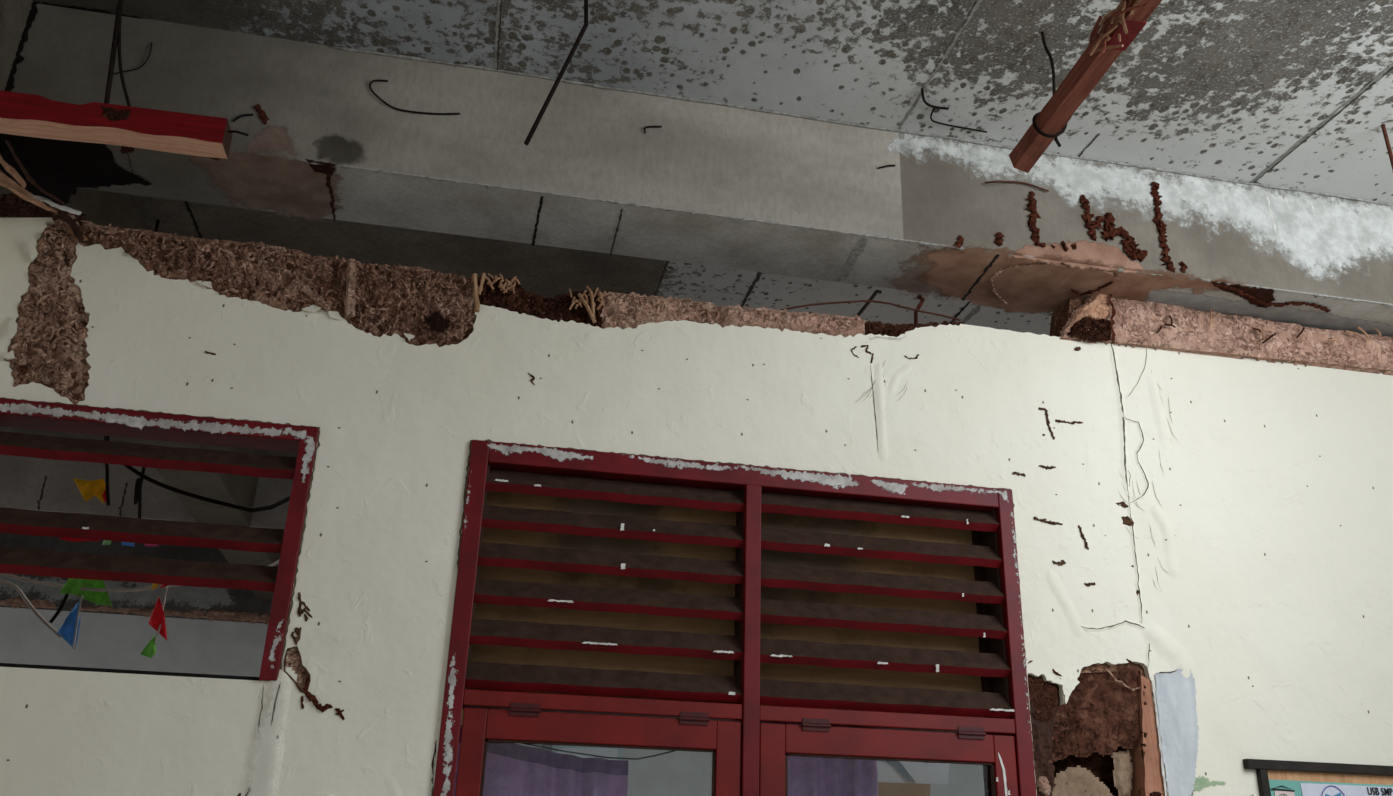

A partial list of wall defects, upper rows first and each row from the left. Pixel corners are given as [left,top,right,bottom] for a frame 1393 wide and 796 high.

damp [318,135,363,164]
flaking render [0,213,964,483]
efflorescence [887,133,1393,280]
peeling [1112,301,1393,376]
flaking render [624,453,1199,796]
crack [1079,343,1179,666]